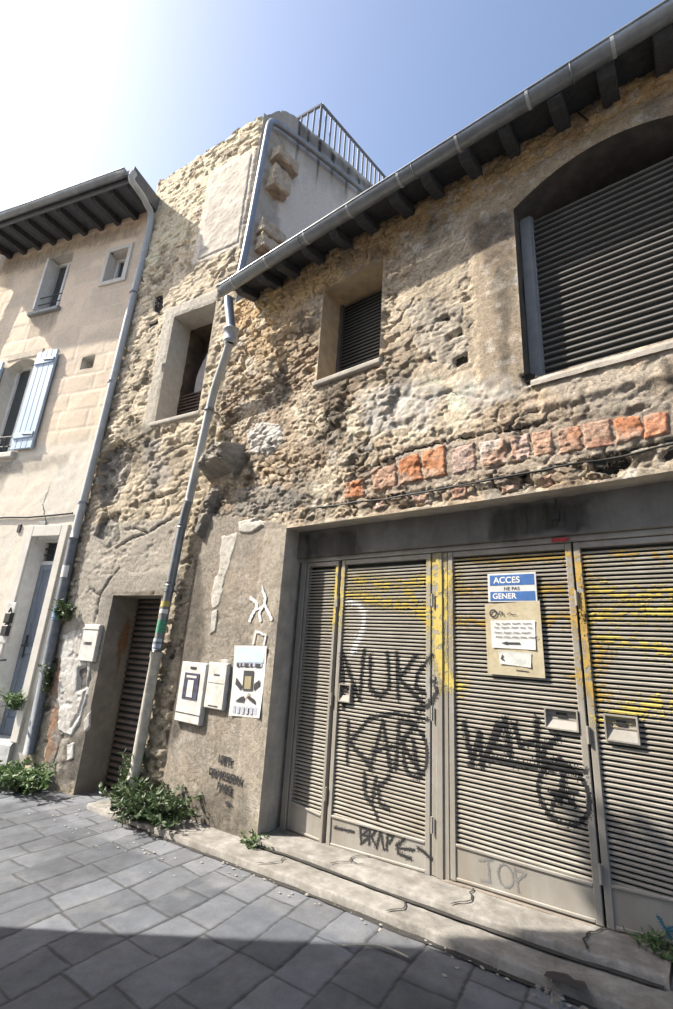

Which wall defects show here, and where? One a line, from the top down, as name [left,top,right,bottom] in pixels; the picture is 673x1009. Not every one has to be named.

flaking render [45,627,92,766]